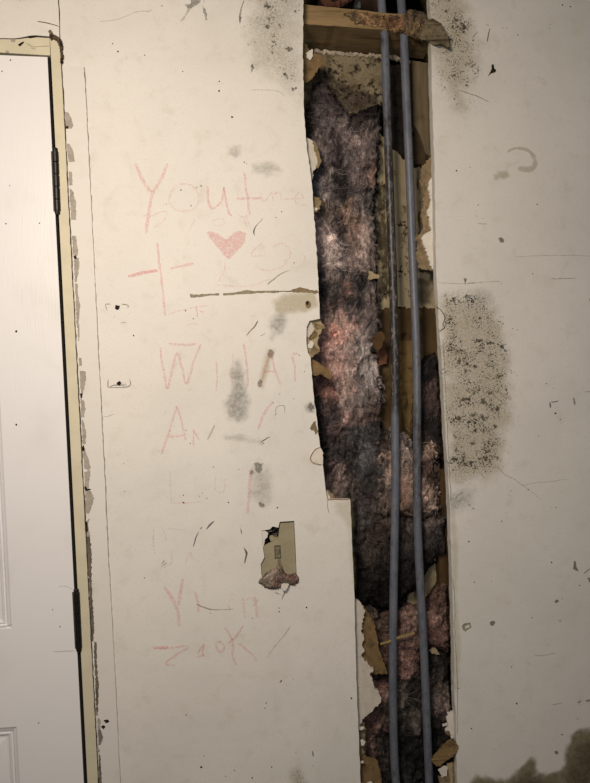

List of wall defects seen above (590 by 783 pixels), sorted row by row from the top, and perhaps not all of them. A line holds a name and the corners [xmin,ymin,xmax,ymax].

spalling [377,0,427,16]
leakage [317,57,381,103]
spalling [390,52,428,66]
leakage [429,0,479,86]
spalling [421,177,433,270]
peeling [307,322,326,356]
leakage [436,294,511,472]
spalling [437,360,445,468]
peeling [310,447,323,465]
spalling [355,598,381,764]
peeling [438,762,453,783]
leakage [473,731,590,783]